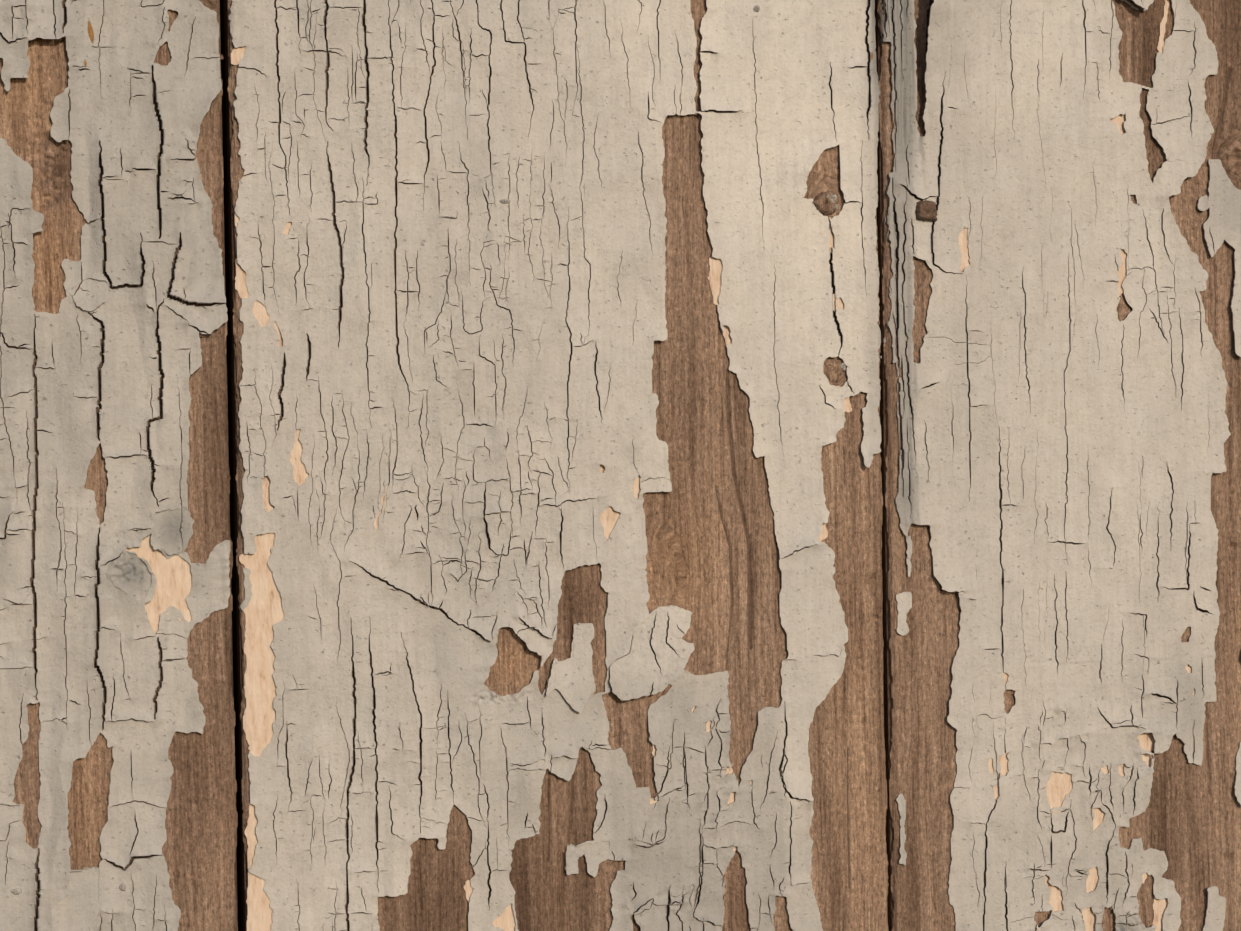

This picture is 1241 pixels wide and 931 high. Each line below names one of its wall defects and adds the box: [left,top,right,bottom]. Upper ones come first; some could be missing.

peeling [0,32,108,317]
crack [1009,4,1109,97]
crack [1108,218,1216,389]
crack [1156,30,1229,135]
peeling [154,289,251,931]
peeling [484,0,792,931]
peeling [804,37,961,931]
crack [1045,276,1211,728]
peeling [1109,0,1241,931]
peeling [377,801,477,931]
crack [842,748,850,931]
crack [971,711,1139,931]